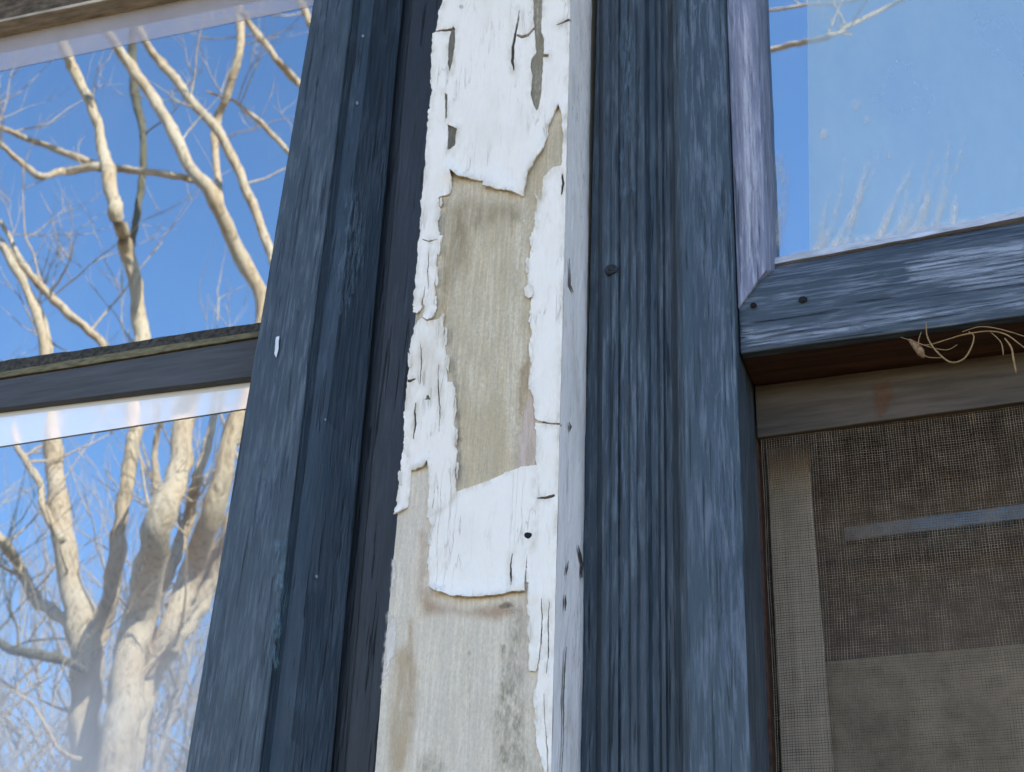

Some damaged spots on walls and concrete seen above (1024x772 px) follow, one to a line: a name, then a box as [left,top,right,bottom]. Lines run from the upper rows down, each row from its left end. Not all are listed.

peeling [531,0,546,111]
peeling [445,94,457,149]
peeling [375,106,568,772]